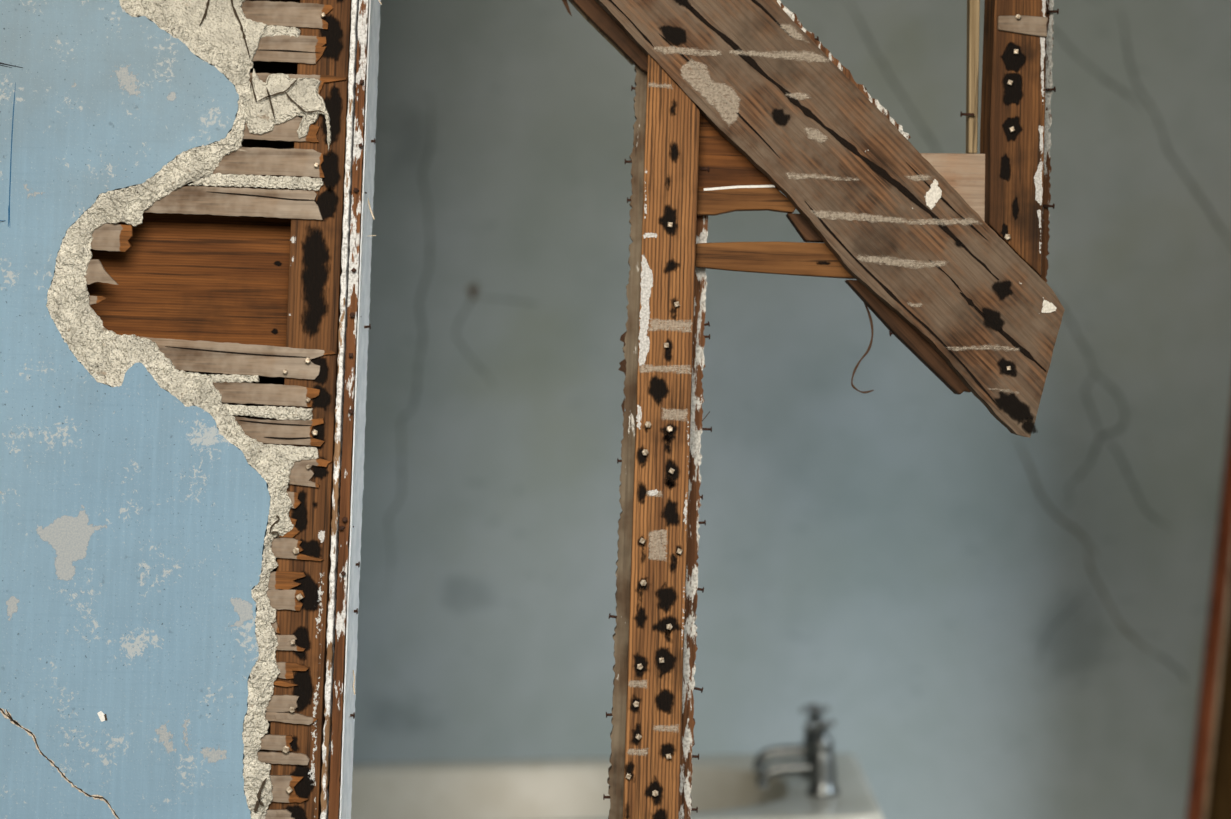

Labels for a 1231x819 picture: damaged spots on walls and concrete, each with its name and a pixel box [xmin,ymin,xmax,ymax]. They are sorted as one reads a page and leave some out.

crack [609,0,780,158]
crack [688,0,999,280]
spalling [36,0,324,819]
crack [805,201,997,405]
crack [929,260,1046,372]
crack [0,708,120,819]